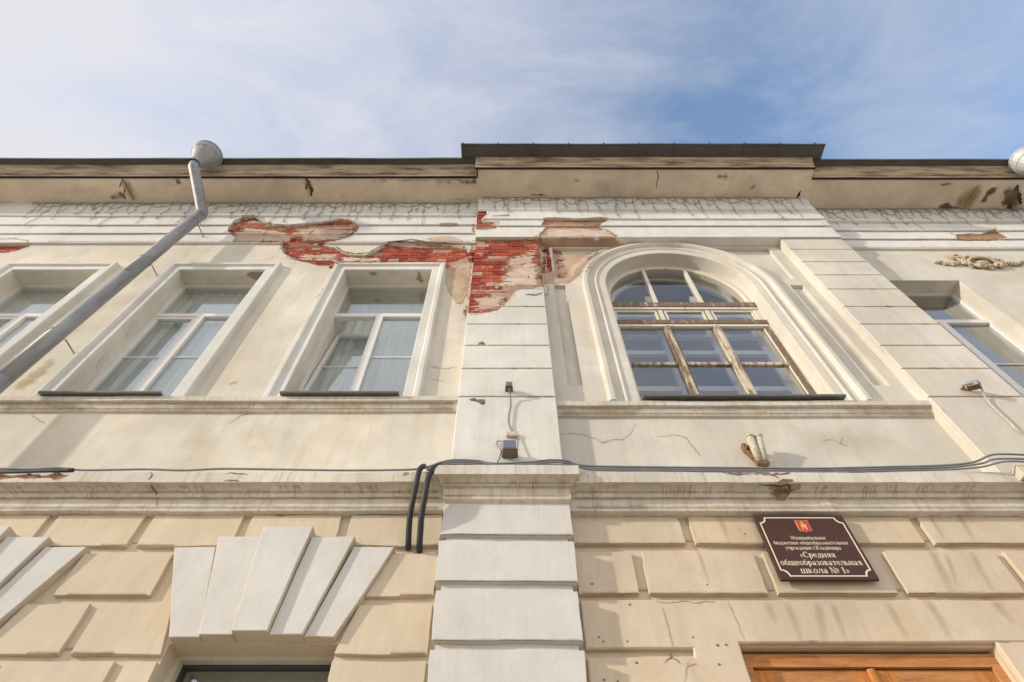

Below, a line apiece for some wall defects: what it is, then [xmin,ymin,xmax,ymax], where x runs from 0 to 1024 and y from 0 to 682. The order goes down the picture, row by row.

crack [305,179,313,196]
damp [939,188,1019,209]
flaking render [0,237,31,253]
flaking render [228,212,623,315]
flaking render [769,480,801,501]
crack [657,600,745,682]